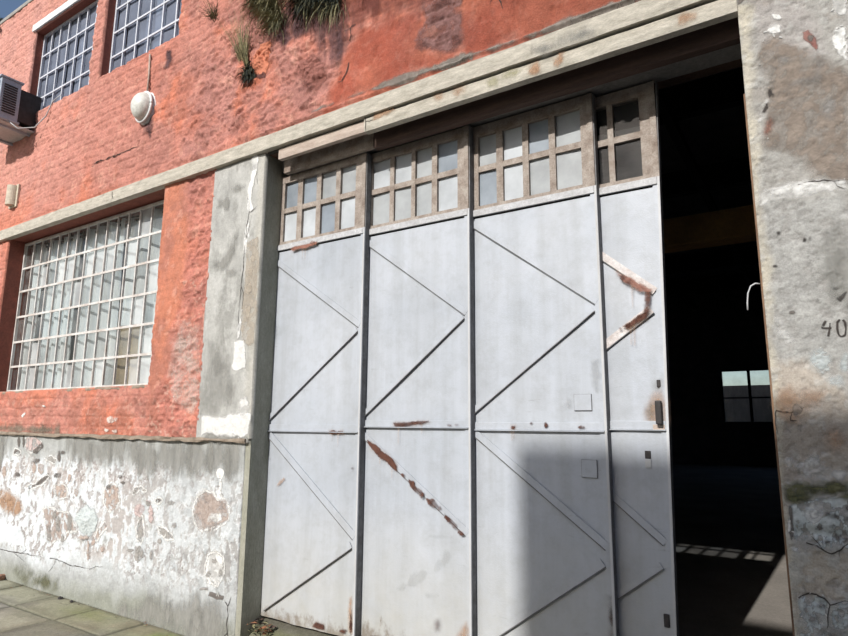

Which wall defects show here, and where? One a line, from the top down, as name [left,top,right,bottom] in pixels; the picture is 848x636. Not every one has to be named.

peeling [247,155,259,212]
spalling [231,222,259,371]
corrosion [619,274,651,330]
peeling [201,397,251,438]
peeling [13,436,78,544]
crack [0,549,98,571]
peeling [127,485,176,563]
spalling [192,489,230,533]
peeling [200,550,225,600]
corrosion [367,440,464,536]
crack [806,536,848,555]
crack [798,593,843,628]